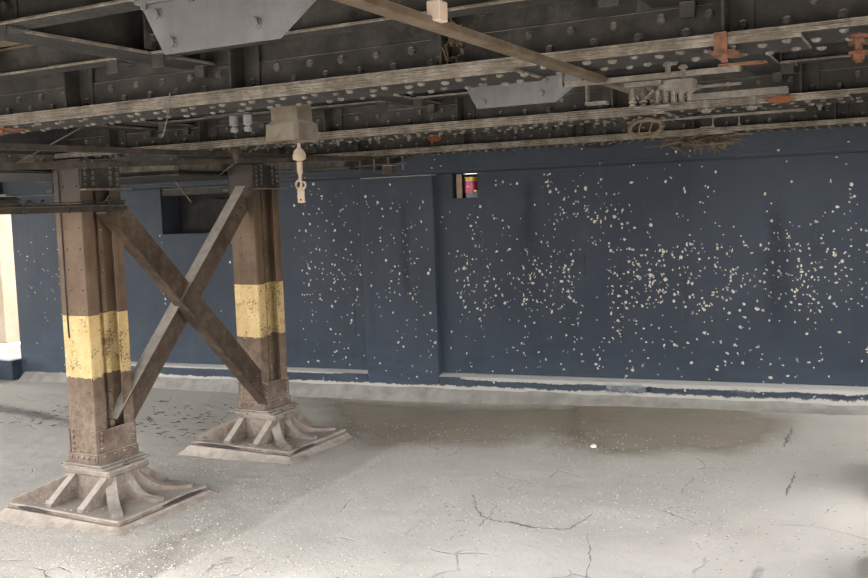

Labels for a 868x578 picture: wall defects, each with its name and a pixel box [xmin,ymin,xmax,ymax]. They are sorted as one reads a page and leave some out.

peeling [300,222,372,340]
peeling [448,173,868,399]
peeling [287,321,350,379]